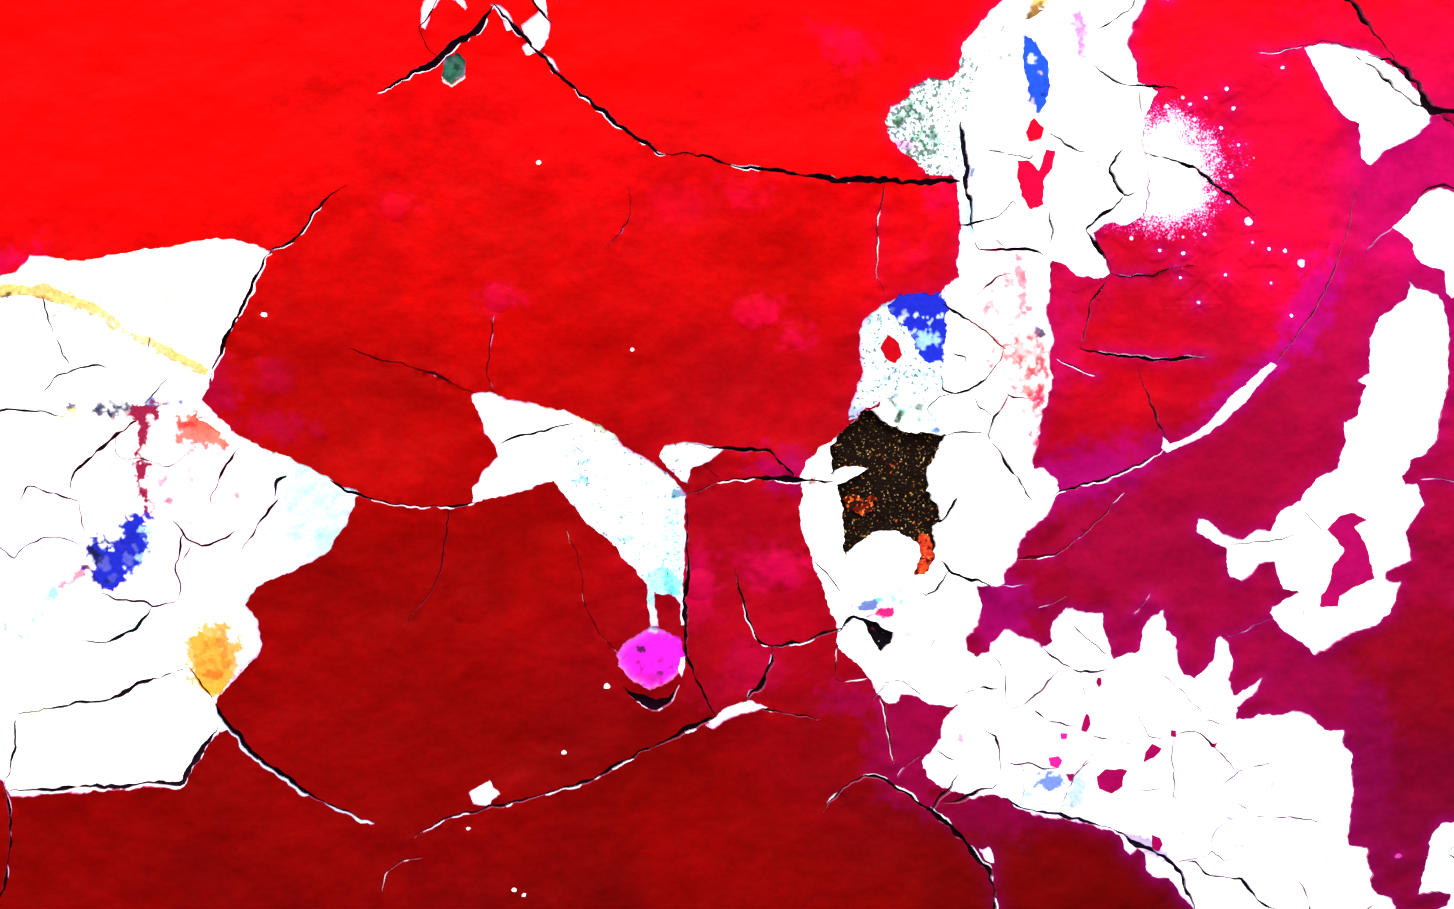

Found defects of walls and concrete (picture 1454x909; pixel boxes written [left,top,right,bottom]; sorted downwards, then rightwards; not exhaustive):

crack [379,0,1238,376]
crack [1260,41,1321,54]
peeling [1305,43,1430,165]
crack [1344,0,1454,126]
peeling [0,238,358,797]
crack [349,316,494,409]
peeling [472,392,723,689]
crack [381,305,1319,909]
peeling [799,0,1396,909]
peeling [1197,187,1454,655]
peeling [1419,822,1454,909]